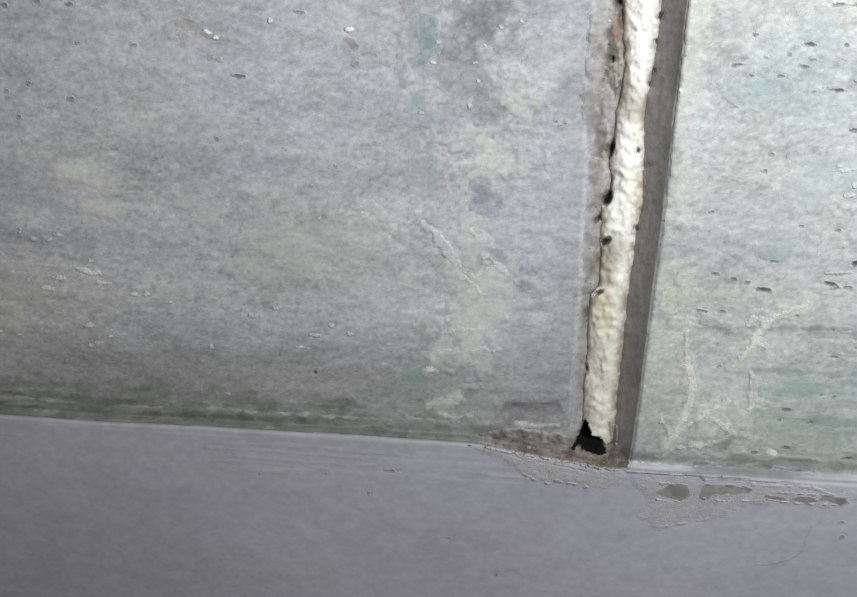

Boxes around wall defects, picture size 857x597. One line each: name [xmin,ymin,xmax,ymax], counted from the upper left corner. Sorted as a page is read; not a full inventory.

leakage [0,0,566,444]
spalling [479,419,628,472]
peeling [655,481,753,503]
peeling [764,490,852,507]